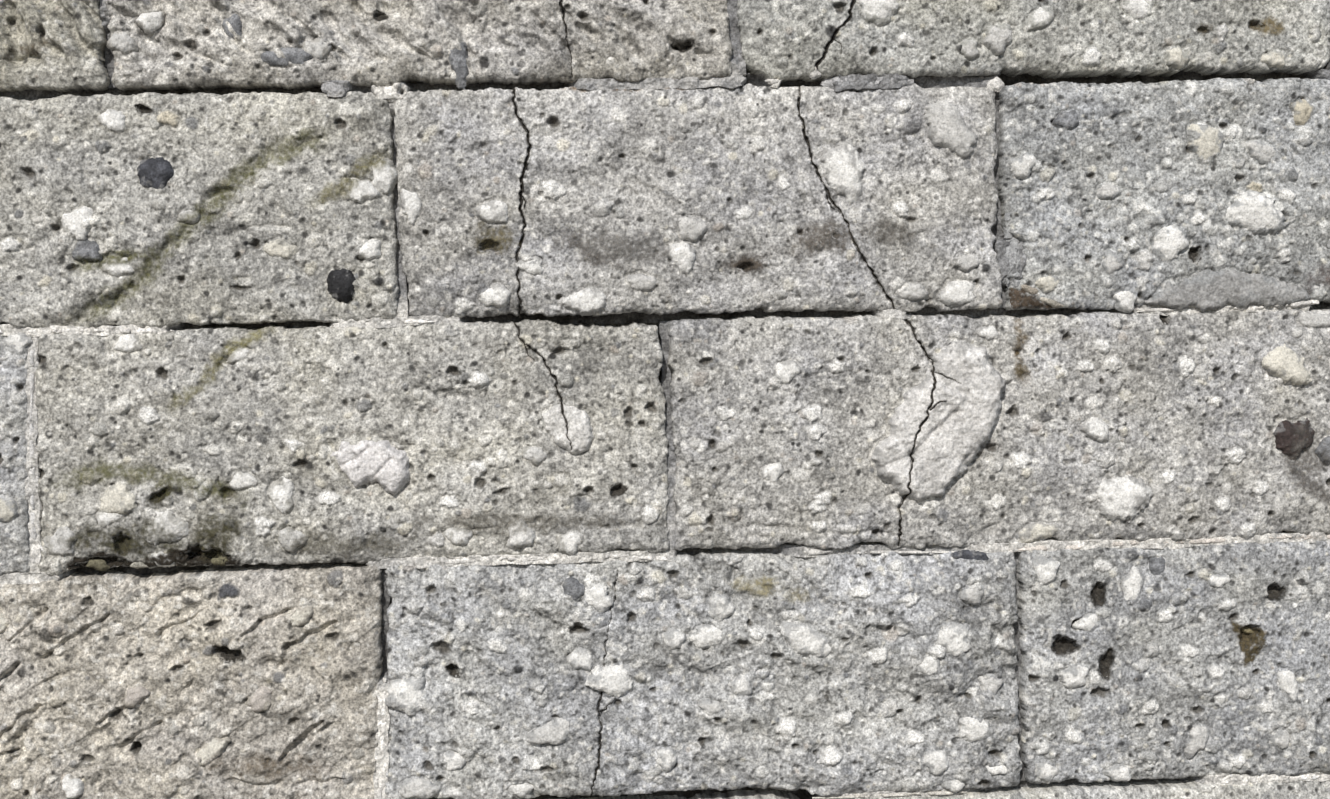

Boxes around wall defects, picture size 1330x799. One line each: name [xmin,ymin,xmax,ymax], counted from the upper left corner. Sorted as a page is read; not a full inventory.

crack [559,0,573,77]
crack [512,88,572,450]
crack [797,0,959,546]
crack [591,569,618,796]